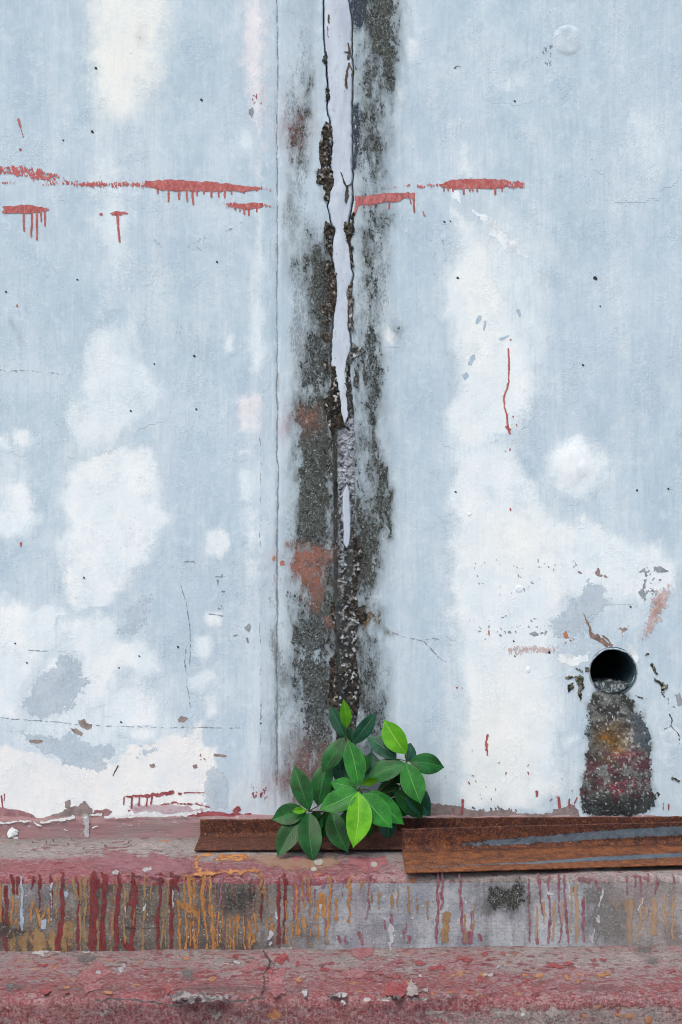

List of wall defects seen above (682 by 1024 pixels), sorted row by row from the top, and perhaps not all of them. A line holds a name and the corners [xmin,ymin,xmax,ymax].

peeling [0,0,367,831]
water stain [282,0,402,810]
peeling [423,127,682,817]
crack [332,427,340,739]
water stain [579,689,660,817]
corrosion [0,853,429,960]
corrosion [440,911,451,943]
corrosion [535,883,580,943]
water stain [487,873,659,964]
corrosion [616,893,675,942]
spalling [165,985,229,1020]
peeling [319,948,483,1015]